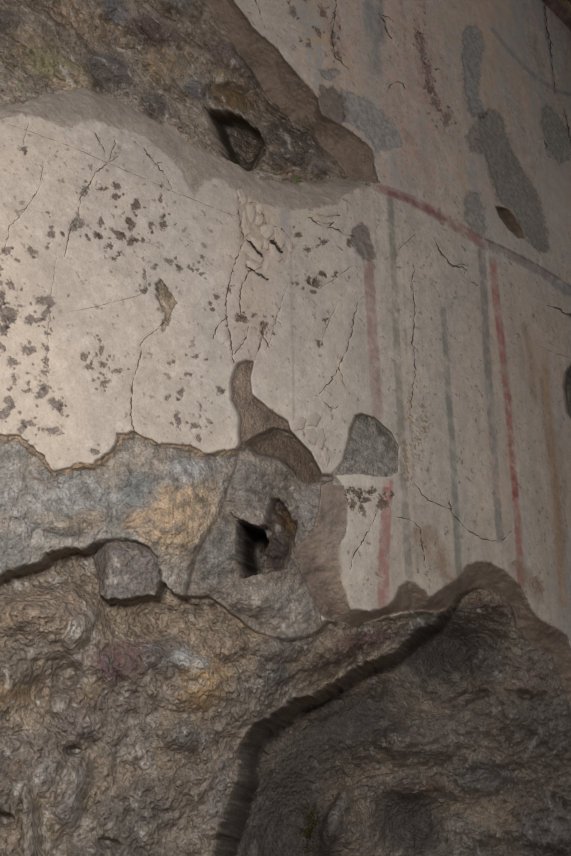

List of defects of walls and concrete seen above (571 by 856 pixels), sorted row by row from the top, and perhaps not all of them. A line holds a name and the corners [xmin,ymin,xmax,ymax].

flaking render [0,0,348,183]
crack [331,0,349,69]
flaking render [28,199,177,260]
flaking render [81,180,125,208]
crack [45,133,172,367]
crack [213,188,293,362]
crack [308,208,353,236]
crack [130,316,170,431]
crack [291,302,358,467]
flaking render [0,255,451,856]
crack [414,483,512,541]